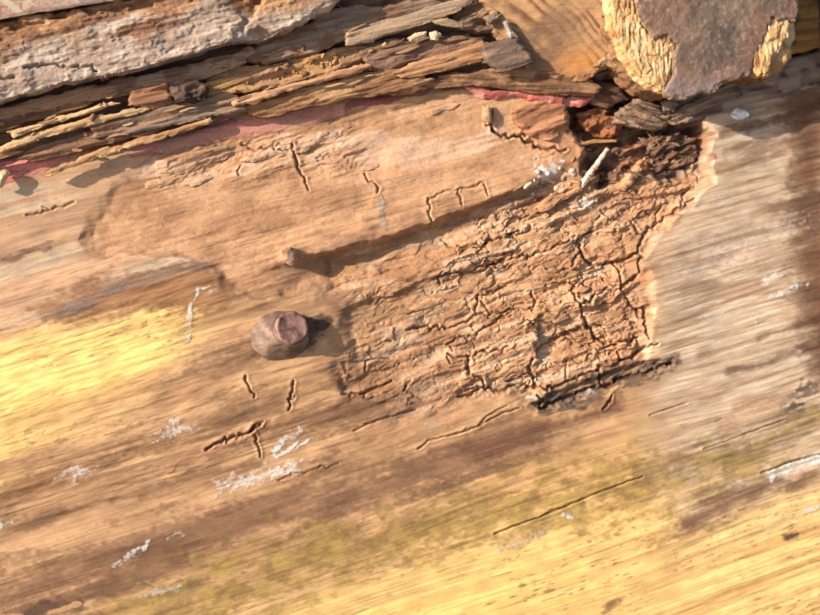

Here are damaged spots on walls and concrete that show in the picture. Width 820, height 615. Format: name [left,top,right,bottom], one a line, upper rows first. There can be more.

spalling [608,0,676,91]
spalling [752,18,790,77]
peeling [121,89,432,158]
peeling [465,86,595,108]
peeling [0,146,103,183]
crack [578,193,686,281]
water stain [761,87,820,432]
corrosion [305,315,333,349]
crack [467,293,533,327]
crack [540,303,668,408]
water stain [1,400,691,615]